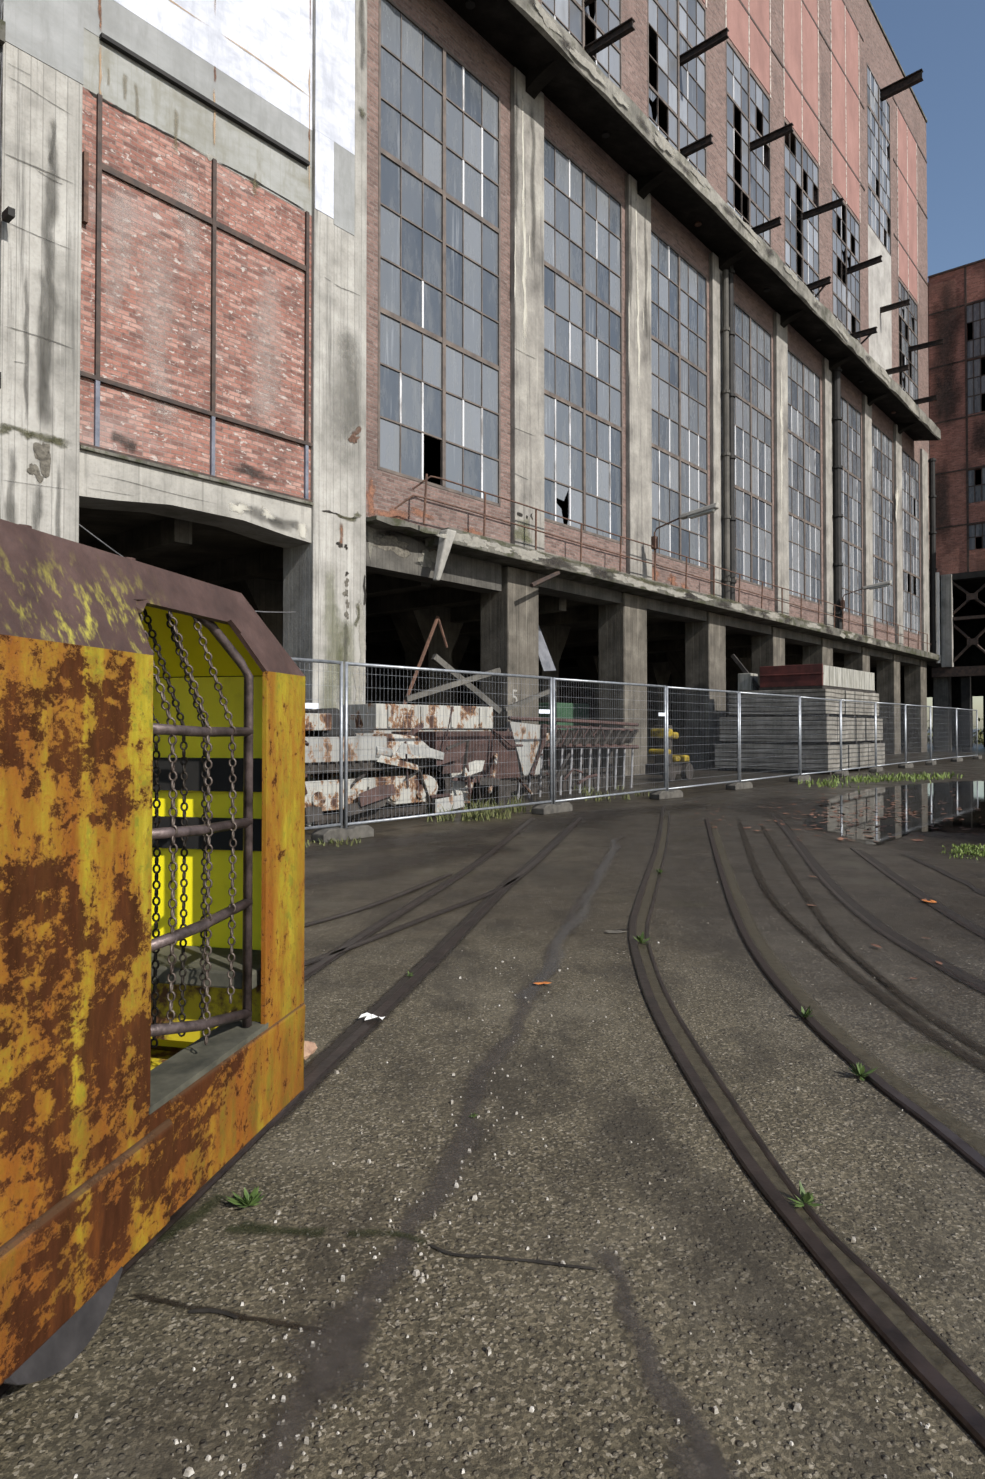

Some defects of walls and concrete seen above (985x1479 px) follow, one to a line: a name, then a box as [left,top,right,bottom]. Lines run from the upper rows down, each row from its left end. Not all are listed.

damp [25,133,56,412]